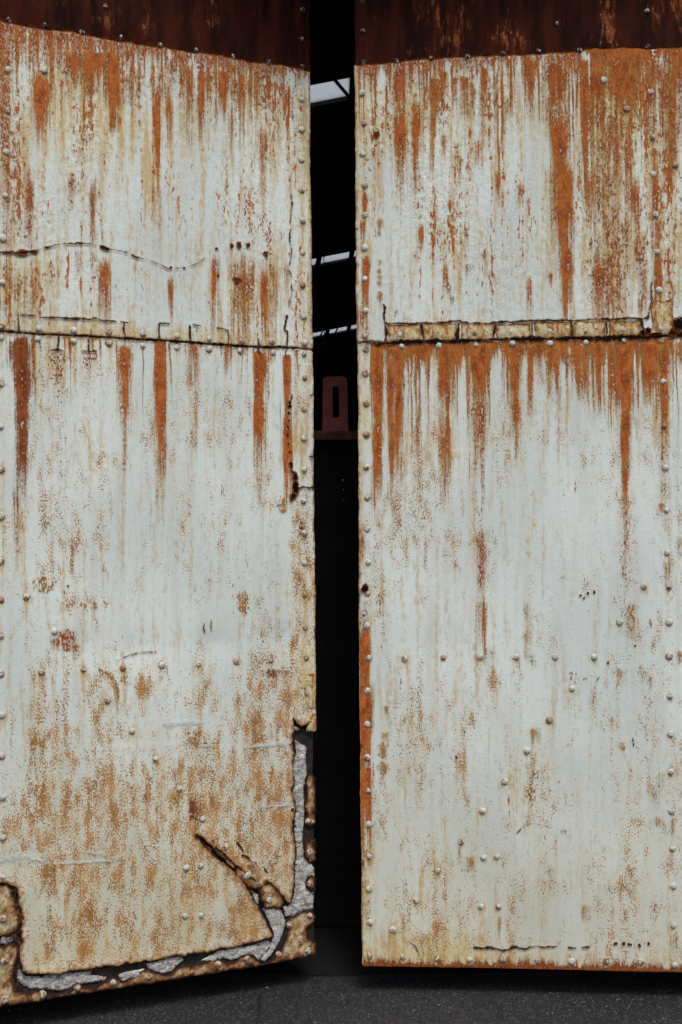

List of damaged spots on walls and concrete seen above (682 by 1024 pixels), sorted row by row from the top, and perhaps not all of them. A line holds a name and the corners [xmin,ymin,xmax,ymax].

crack [0,179,299,358]
rust [0,20,309,513]
rust [357,48,682,324]
crack [358,282,682,347]
crack [290,456,314,501]
rust [357,192,682,679]
peeling [201,726,314,962]
rust [359,590,391,919]
peeling [17,969,106,991]
peeling [119,956,183,980]
rust [0,883,316,1008]
crack [473,945,590,953]